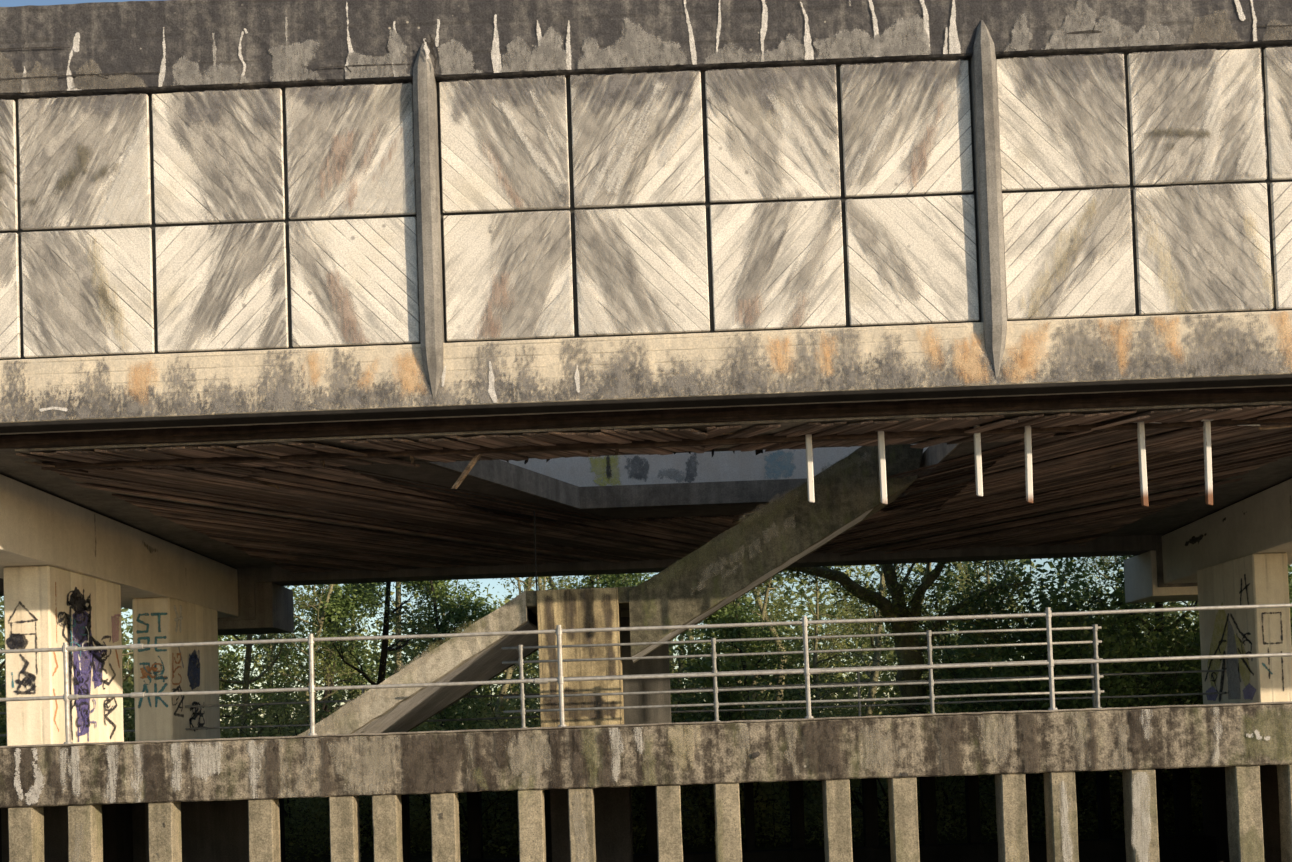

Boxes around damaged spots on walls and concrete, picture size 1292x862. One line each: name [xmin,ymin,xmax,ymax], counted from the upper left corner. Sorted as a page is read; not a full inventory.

water stain [0,0,1292,422]
rust [399,354,418,392]
rust [923,330,988,383]
water stain [544,588,642,788]
water stain [19,746,81,805]
water stain [105,743,223,802]
water stain [248,739,280,799]
water stain [318,737,335,796]
water stain [400,732,508,793]
water stain [938,716,963,775]
water stain [1087,711,1104,770]
water stain [1130,709,1156,752]